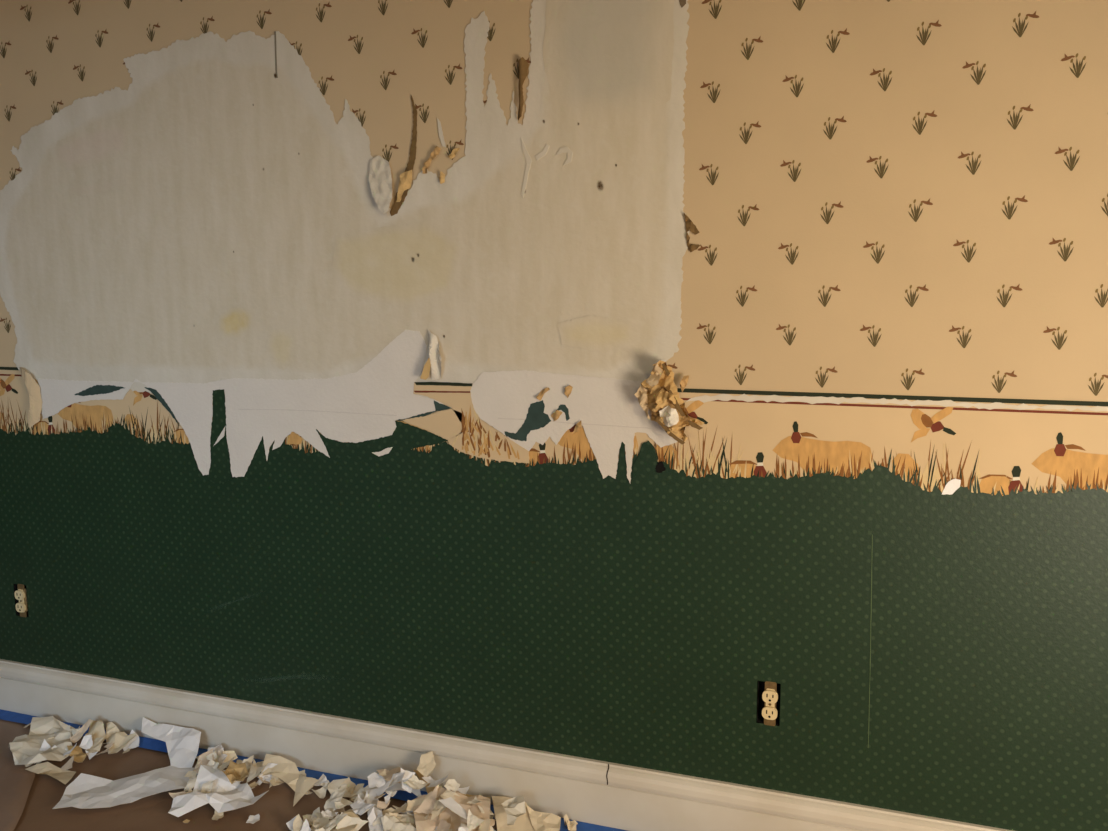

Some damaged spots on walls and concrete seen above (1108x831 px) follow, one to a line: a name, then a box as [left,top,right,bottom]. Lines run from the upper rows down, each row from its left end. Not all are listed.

flaking render [3,53,677,483]